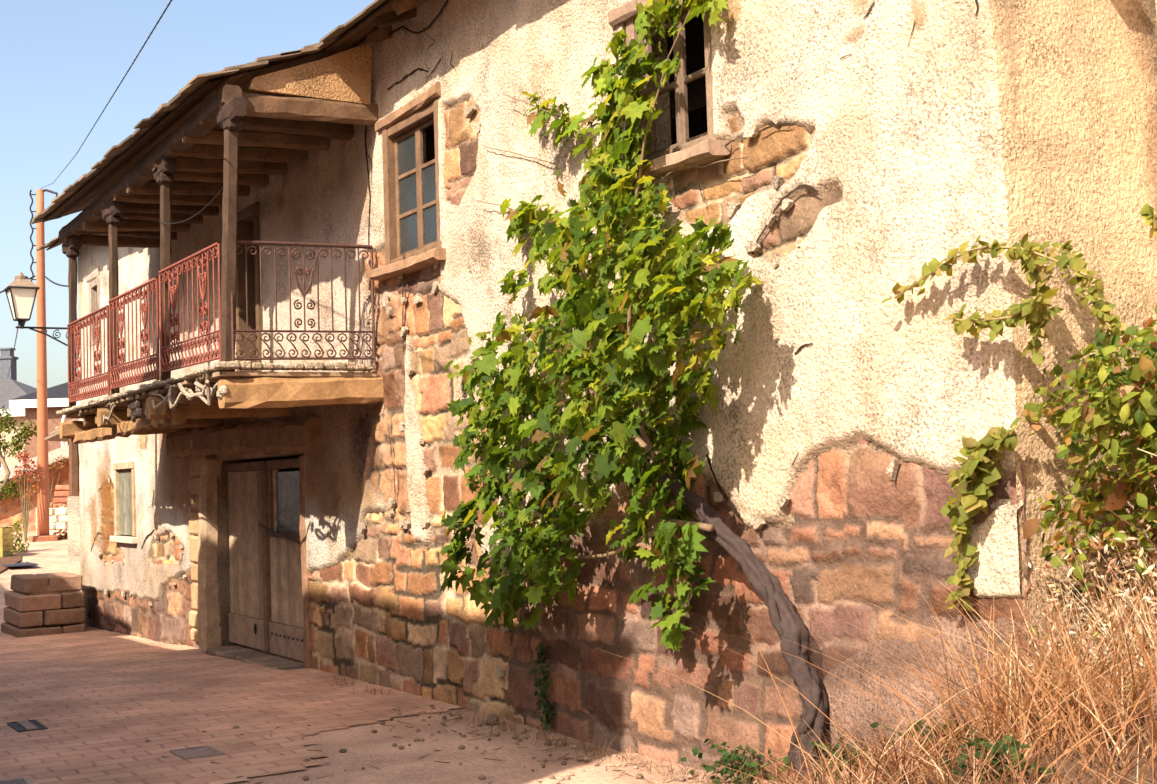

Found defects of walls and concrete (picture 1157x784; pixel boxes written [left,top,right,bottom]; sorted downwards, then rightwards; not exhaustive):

flaking render [443,97,481,206]
flaking render [654,112,843,268]
flaking render [98,476,126,565]
flaking render [88,526,199,648]
flaking render [308,252,804,780]
flaking render [674,438,1032,701]